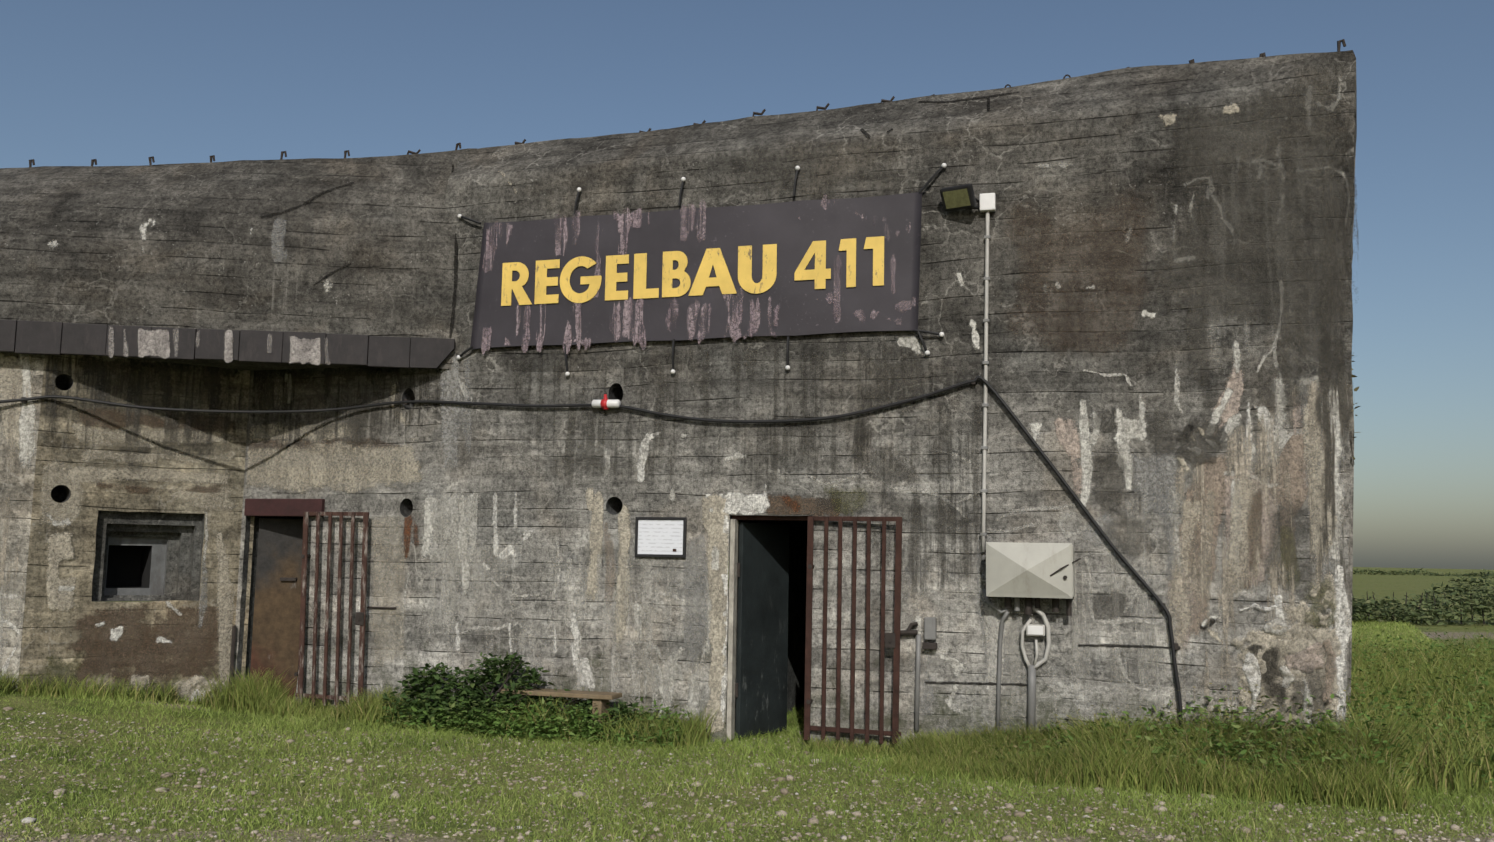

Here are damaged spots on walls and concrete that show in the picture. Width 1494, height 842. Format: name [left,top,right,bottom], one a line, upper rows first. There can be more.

damp [0,353,472,527]
damp [1030,66,1358,729]
damp [66,533,234,684]
corrosion [404,515,418,558]
damp [421,493,533,670]
spalling [1200,595,1341,727]